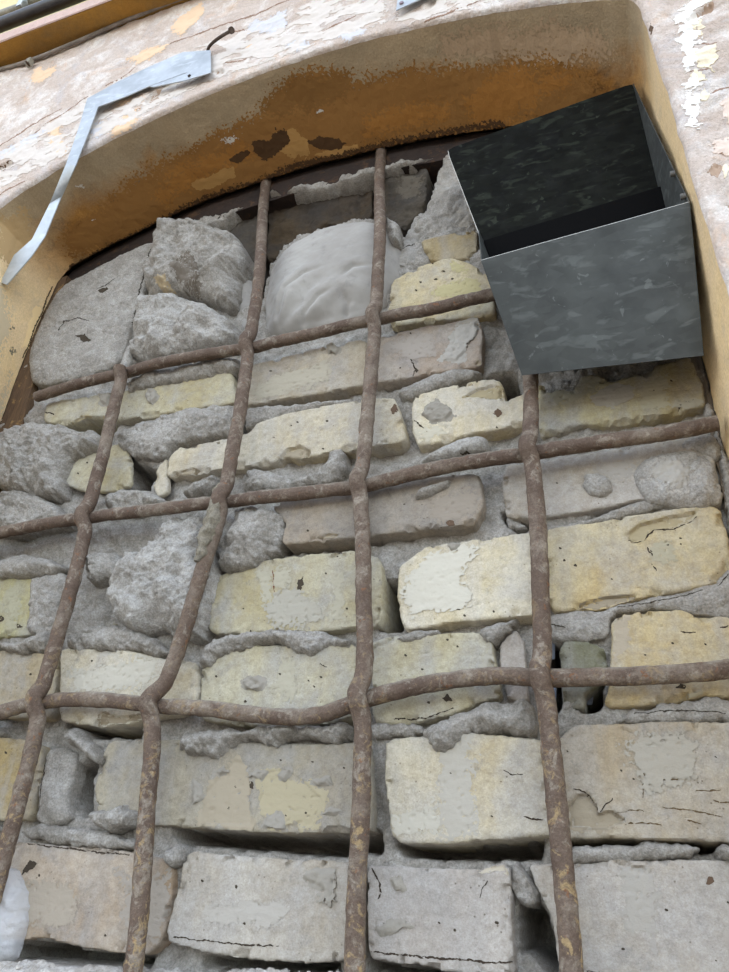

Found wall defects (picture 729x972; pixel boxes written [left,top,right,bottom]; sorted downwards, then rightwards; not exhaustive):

rust [29,66,57,83]
peeling [673,0,720,130]
rust [56,51,614,261]
spalling [707,163,729,178]
rust [0,205,43,267]
rust [380,331,437,362]
rust [426,486,481,525]
spalling [625,507,699,552]
crack [628,516,697,571]
rust [255,561,292,608]
rust [612,615,633,662]
crack [574,773,729,826]